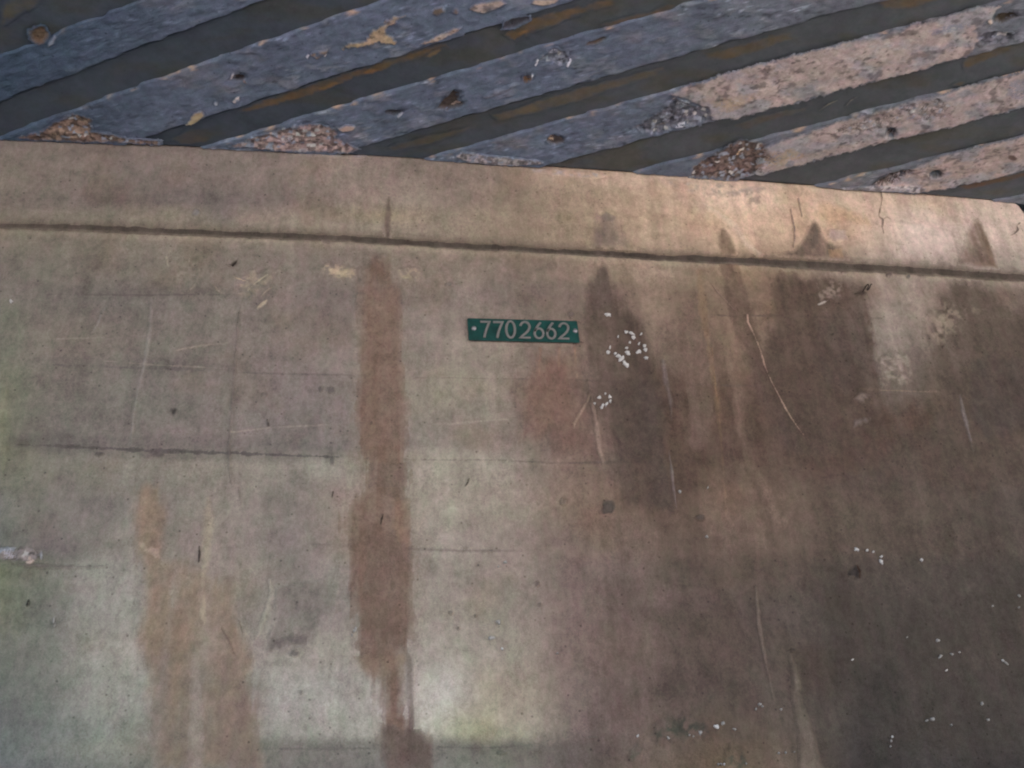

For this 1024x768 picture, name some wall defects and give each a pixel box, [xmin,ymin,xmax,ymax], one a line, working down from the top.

spalling [15,113,164,146]
spalling [226,122,361,154]
peeling [341,15,406,51]
peeling [629,5,1020,135]
peeling [654,70,1024,207]
leakage [572,202,1024,530]
corrosion [320,252,440,768]
corrosion [125,477,271,768]
leakage [611,579,775,719]
leakage [786,650,824,768]
leakage [814,558,1024,768]